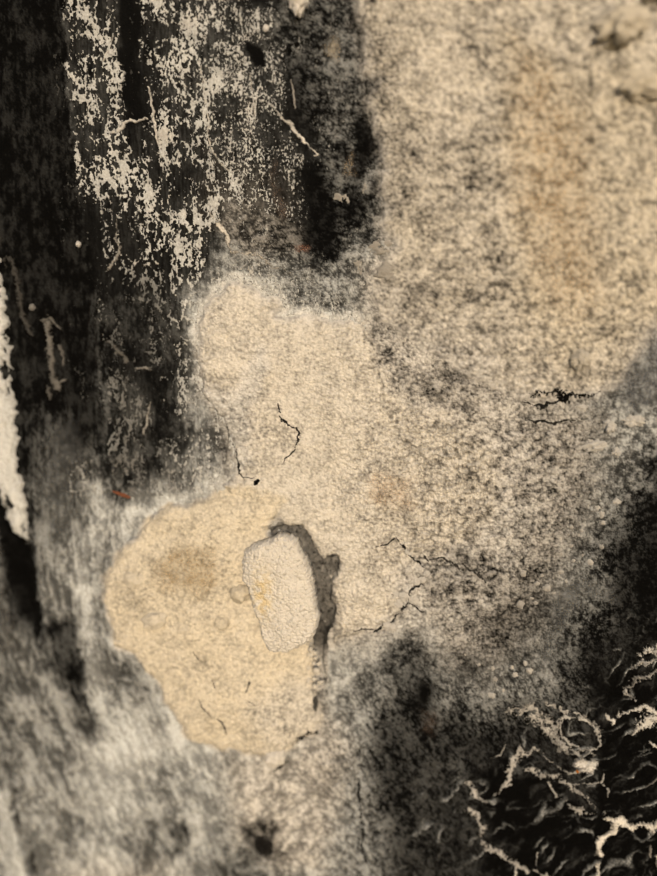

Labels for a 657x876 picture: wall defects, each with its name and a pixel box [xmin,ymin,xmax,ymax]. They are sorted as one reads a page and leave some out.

crack [277,403,300,462]
crack [522,387,601,426]
crack [268,522,340,690]
crack [354,537,487,633]